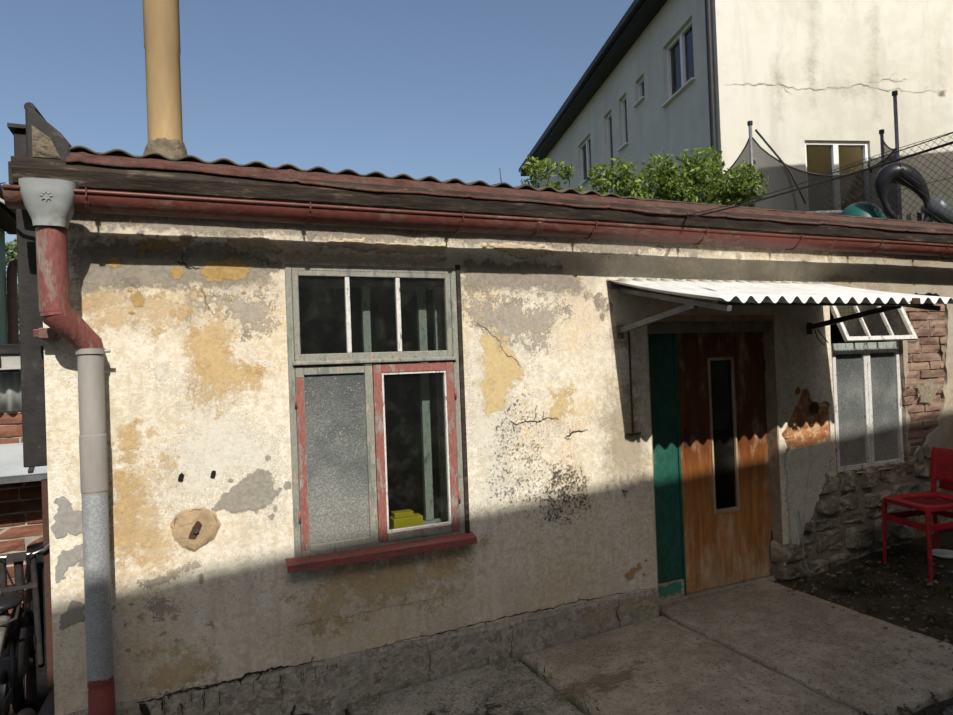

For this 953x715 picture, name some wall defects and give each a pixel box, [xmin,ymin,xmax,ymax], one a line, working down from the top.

crack [725,72,937,93]
peeling [69,235,447,408]
crack [468,321,519,364]
peeling [461,289,573,415]
leakage [465,322,593,534]
crack [511,406,588,439]
peeling [548,387,575,423]
spalling [782,387,830,452]
peeling [212,455,292,519]
peeling [107,418,203,642]
crack [136,657,323,715]